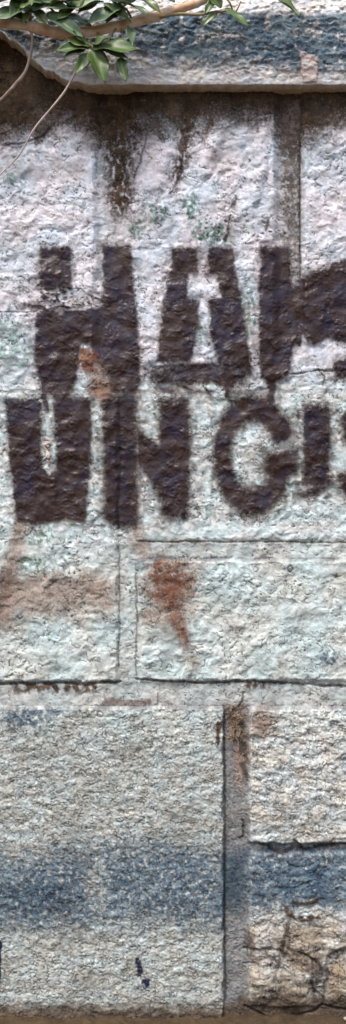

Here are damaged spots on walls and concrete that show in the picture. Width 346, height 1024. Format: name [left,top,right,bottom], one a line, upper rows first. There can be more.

water stain [0,39,346,278]
rust [79,348,109,399]
rust [135,527,195,645]